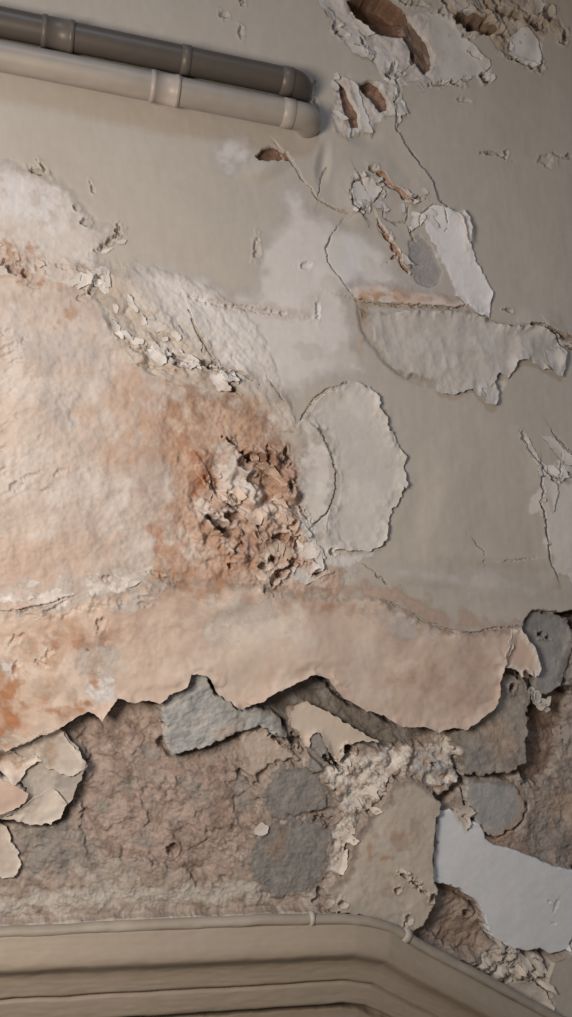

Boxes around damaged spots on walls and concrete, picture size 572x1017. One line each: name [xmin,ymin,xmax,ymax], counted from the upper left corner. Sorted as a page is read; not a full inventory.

peeling [319,0,570,138]
crack [279,69,470,309]
flaking render [0,161,342,611]
leakage [75,264,476,644]
peeling [132,171,572,552]
peeling [523,436,572,584]
crack [530,322,572,350]
crack [1,597,65,616]
leakage [0,565,167,616]
crack [363,564,518,635]
leakage [0,729,47,762]
spalling [0,582,572,1011]